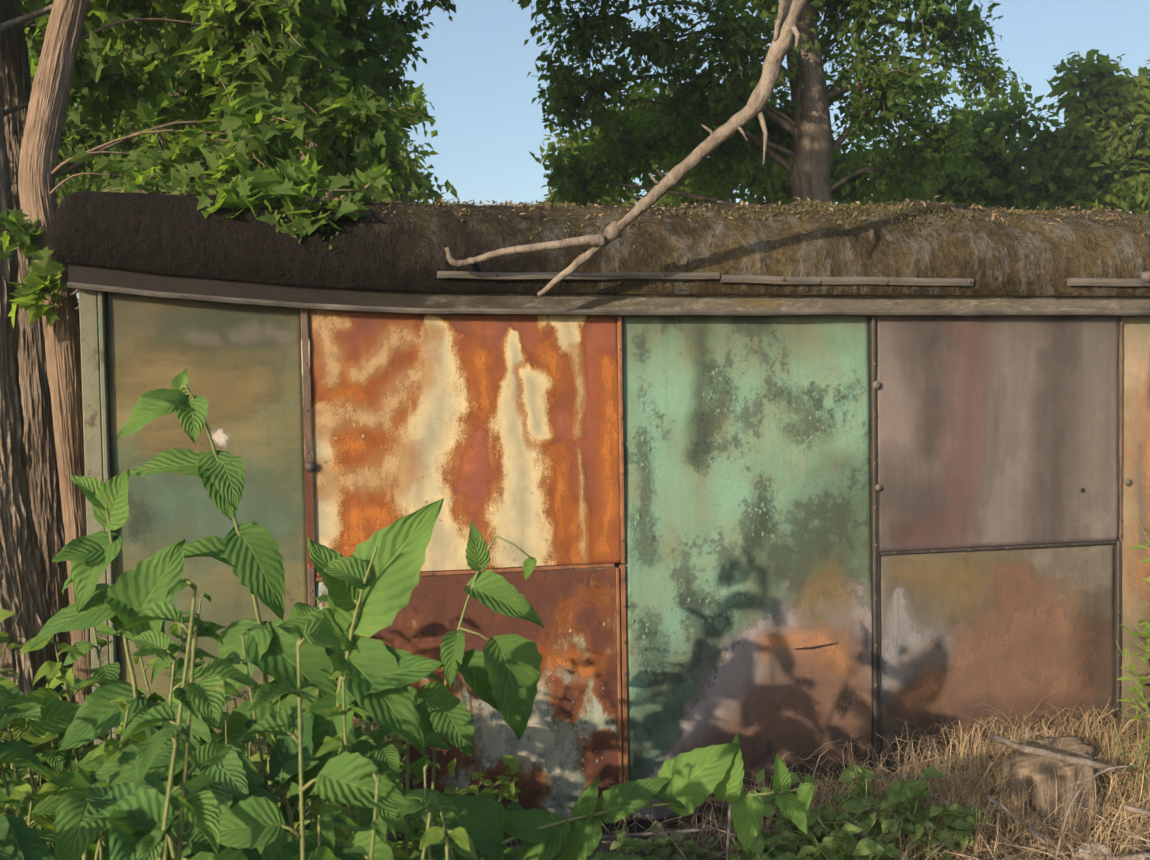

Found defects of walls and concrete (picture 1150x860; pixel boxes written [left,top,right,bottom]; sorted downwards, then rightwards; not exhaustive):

rust [339,496,397,557]
rust [357,343,620,812]
rust [702,630,872,811]
rust [888,585,1109,767]